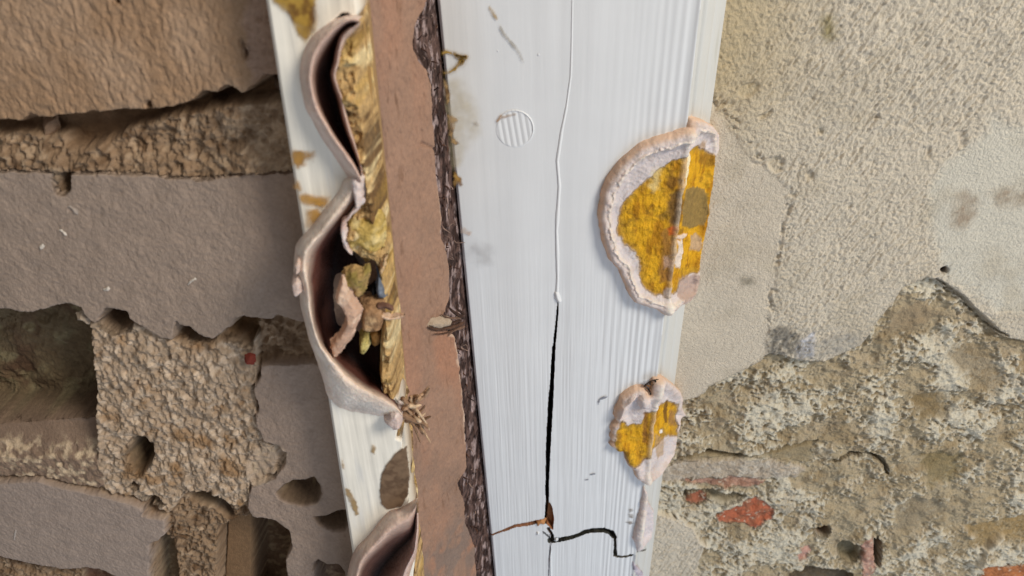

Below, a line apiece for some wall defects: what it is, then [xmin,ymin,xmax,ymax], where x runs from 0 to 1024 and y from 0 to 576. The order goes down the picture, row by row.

spalling [173,315,261,365]
crack [490,302,646,576]
flaking render [657,265,1024,576]
peeling [346,489,358,515]
peeling [81,567,112,576]
hole [215,513,291,576]
hole [311,559,346,576]